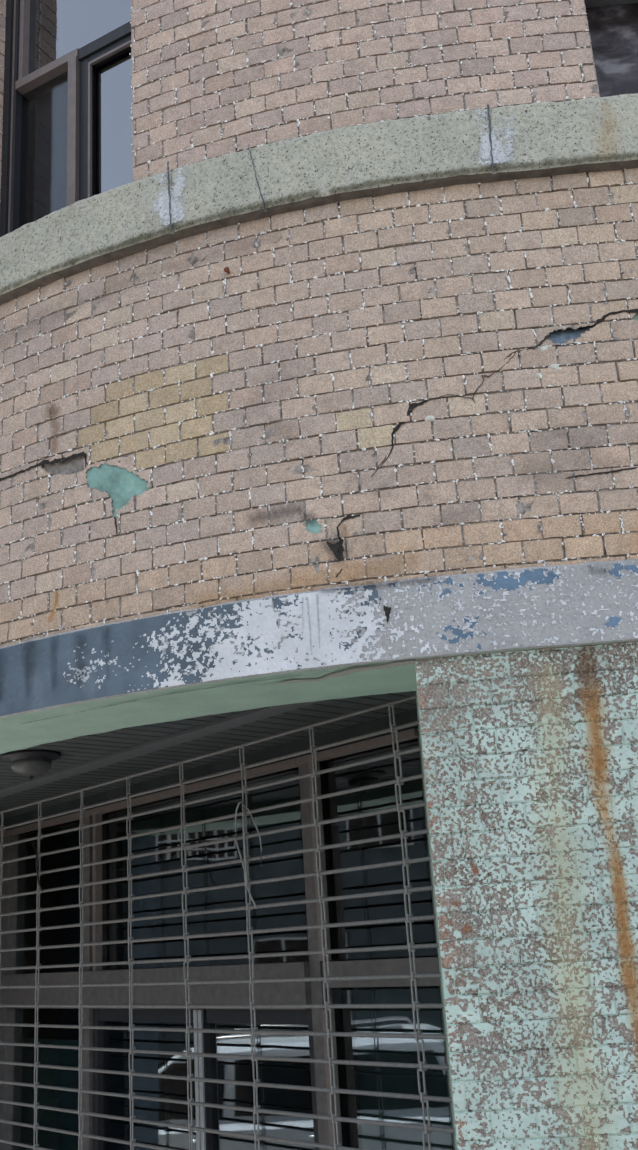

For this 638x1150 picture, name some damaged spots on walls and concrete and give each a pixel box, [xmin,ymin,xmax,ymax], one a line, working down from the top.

crack [596,309,638,323]
crack [371,335,549,477]
crack [0,452,87,481]
spalling [42,457,151,517]
spalling [305,519,345,561]
crack [336,515,360,578]
peeling [0,561,638,1150]
rust [582,690,638,1042]